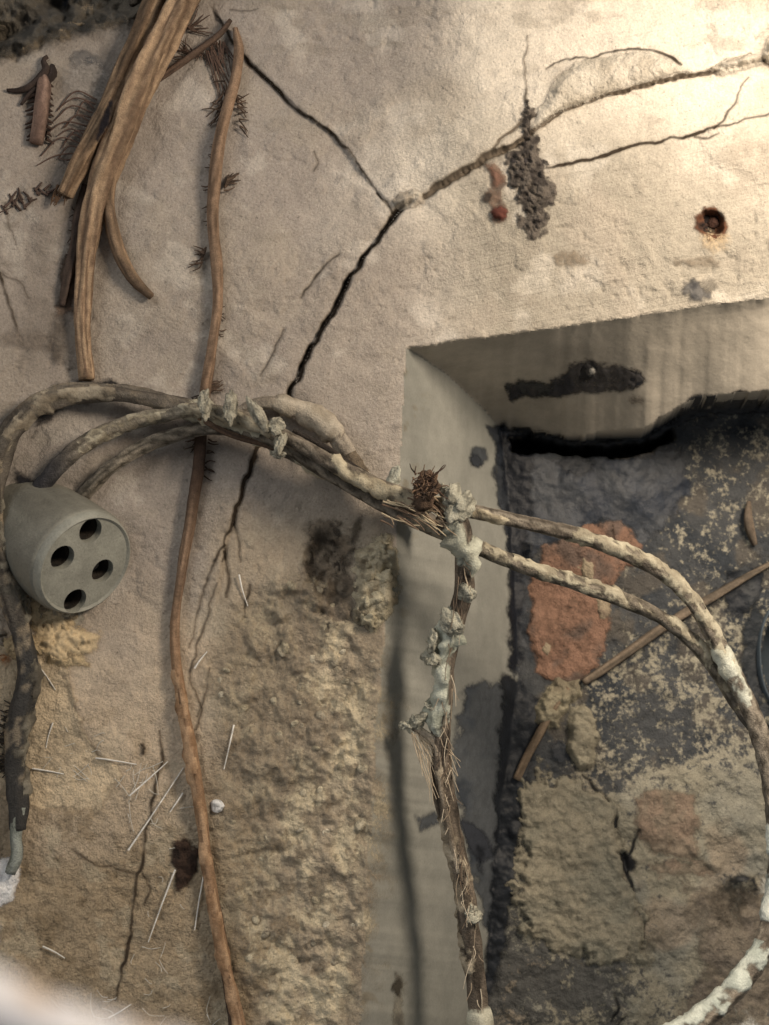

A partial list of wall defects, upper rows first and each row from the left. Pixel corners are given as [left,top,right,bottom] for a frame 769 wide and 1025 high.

crack [217,16,714,397]
rust [483,163,508,223]
damp [505,99,557,240]
crack [546,93,769,168]
rust [695,207,728,249]
crack [189,446,261,730]
crack [75,730,164,1001]